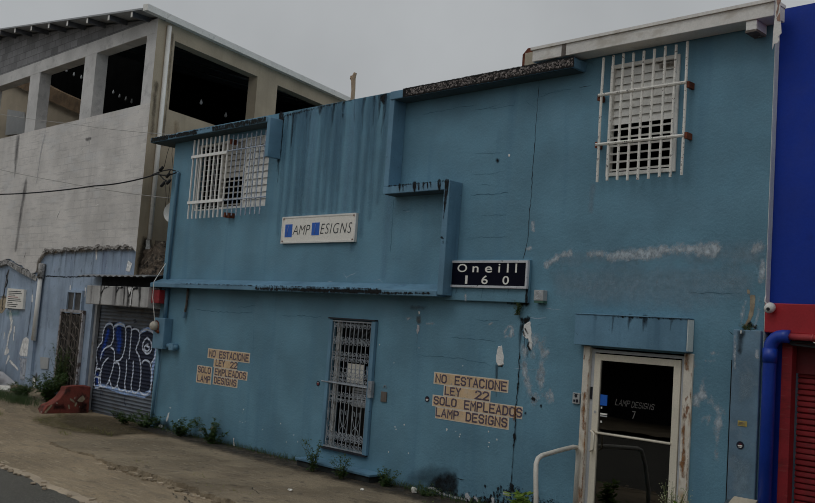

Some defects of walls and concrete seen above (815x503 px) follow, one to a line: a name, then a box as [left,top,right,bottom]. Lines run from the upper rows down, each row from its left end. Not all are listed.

water stain [279,93,387,160]
water stain [388,179,449,218]
crack [428,86,586,258]
water stain [589,243,720,259]
peeling [496,345,504,379]
peeling [509,316,548,408]
crack [509,350,538,498]